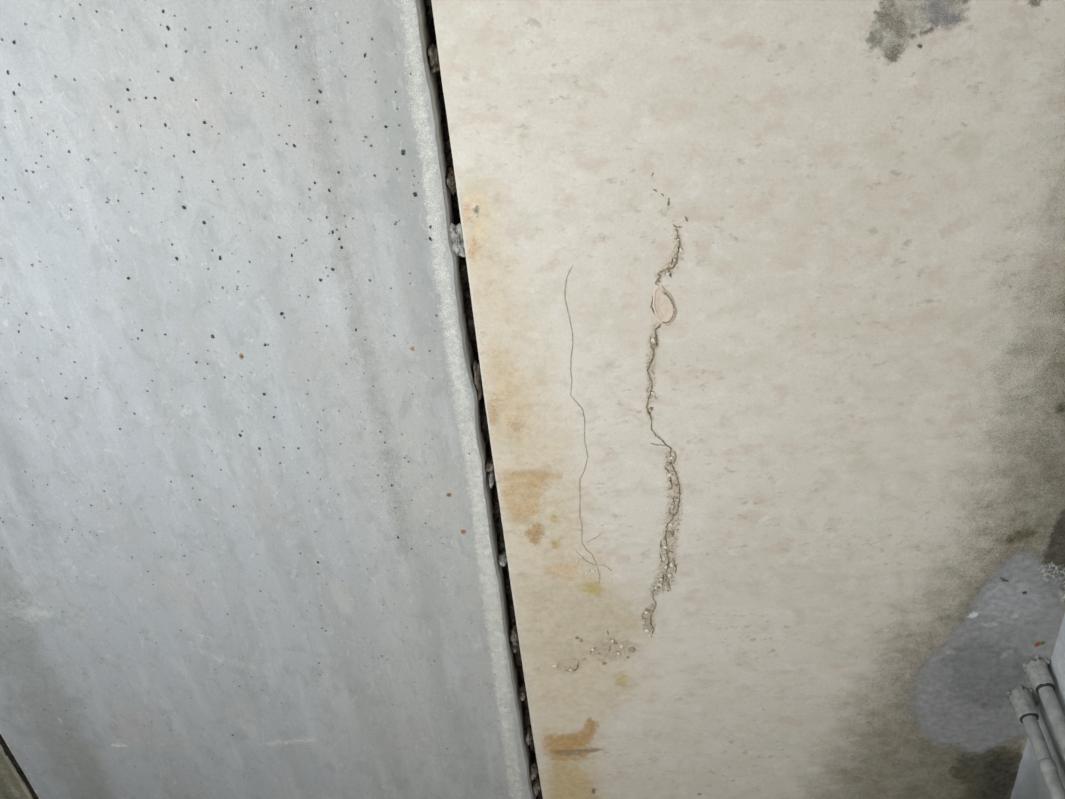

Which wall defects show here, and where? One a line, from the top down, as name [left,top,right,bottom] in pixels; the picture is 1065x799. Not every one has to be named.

leakage [857,0,970,67]
crack [551,173,688,674]
leakage [785,36,1065,799]
rust [540,716,604,764]